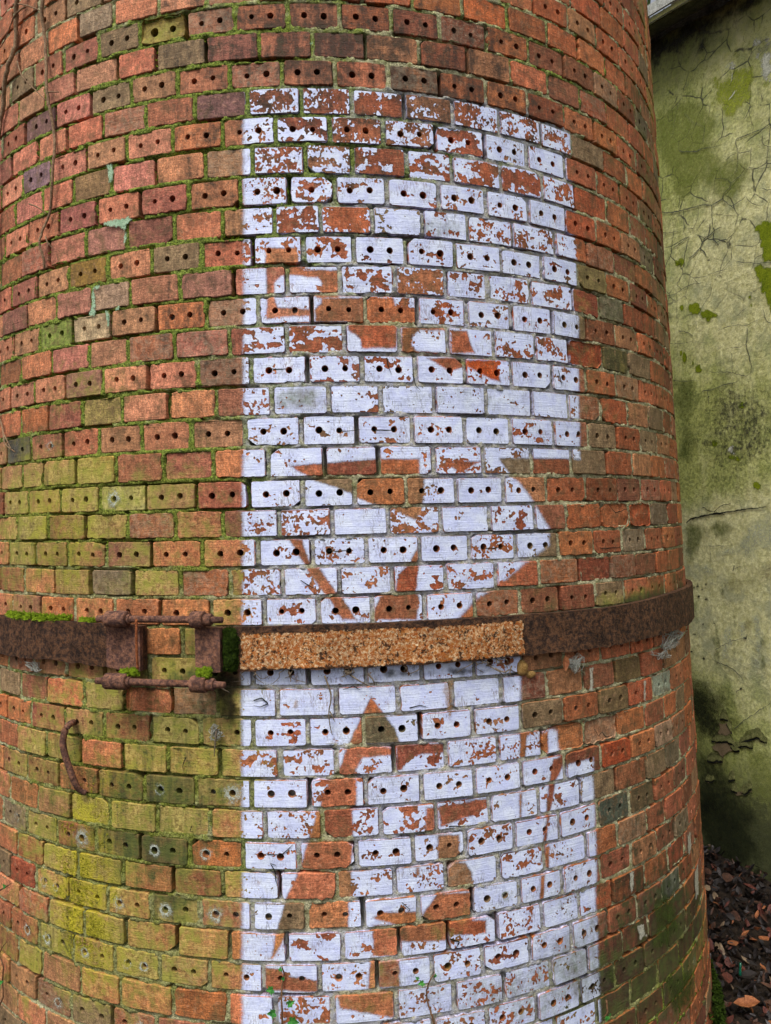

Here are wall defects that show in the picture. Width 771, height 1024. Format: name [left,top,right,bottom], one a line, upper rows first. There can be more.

water stain [753,39,771,81]
peeling [243,88,574,324]
crack [663,95,771,296]
peeling [243,326,462,426]
crack [670,308,770,402]
peeling [430,505,530,590]
crack [686,504,763,523]
corrosion [239,620,525,670]
water stain [693,681,723,736]
spalling [241,722,542,897]
water stain [698,753,753,862]
spalling [400,906,549,1024]